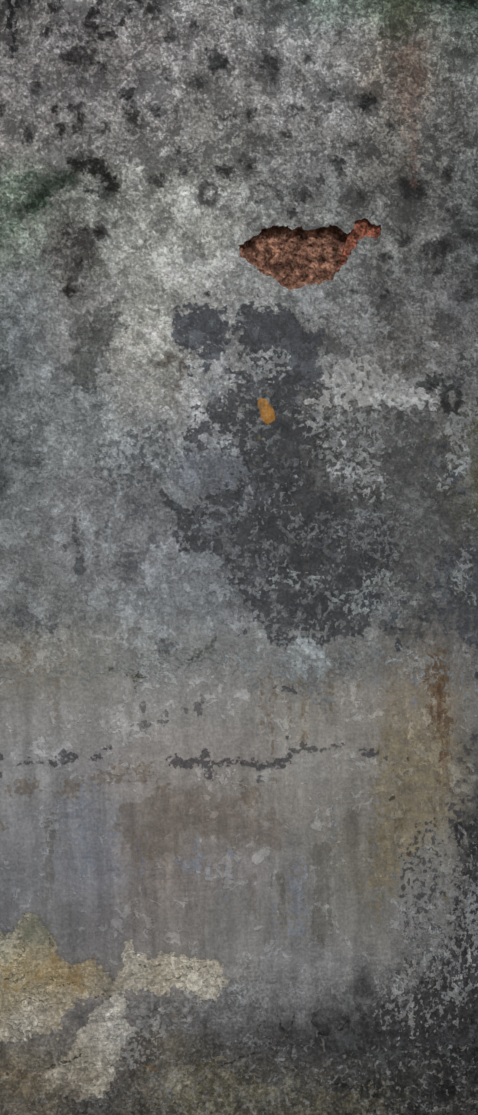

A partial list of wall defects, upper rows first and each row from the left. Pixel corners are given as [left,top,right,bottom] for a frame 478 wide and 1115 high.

spalling [238,219,381,290]
water stain [156,350,187,406]
corrosion [256,397,277,441]
water stain [450,780,478,877]
peeling [0,733,478,1115]
water stain [387,1078,459,1115]